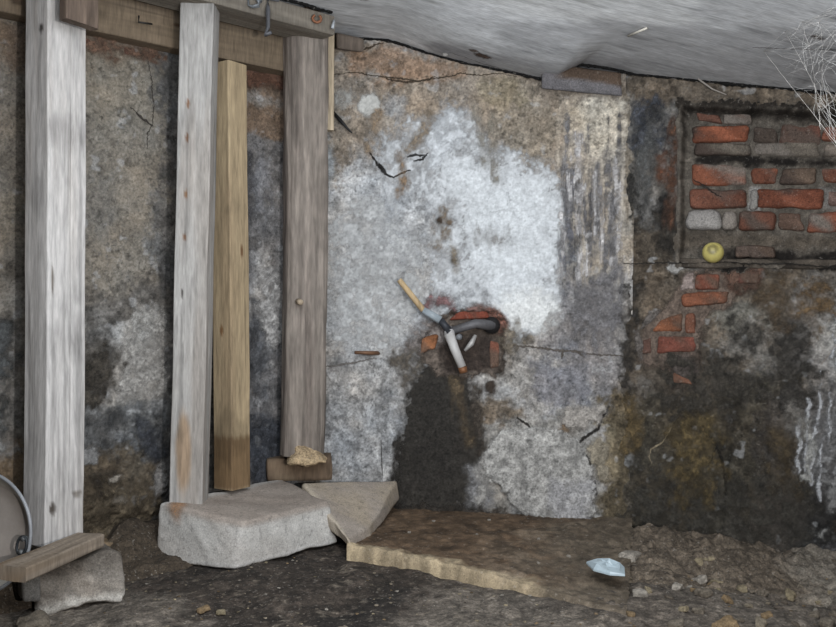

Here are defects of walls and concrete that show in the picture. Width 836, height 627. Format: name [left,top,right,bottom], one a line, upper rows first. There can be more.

crack [282,0,333,14]
peeling [335,92,380,116]
crack [369,152,428,178]
crack [334,37,541,83]
peeling [327,107,566,394]
leakage [558,93,678,401]
spalling [635,264,763,389]
leakage [391,363,493,510]
crack [579,404,610,496]
leakage [629,314,832,548]